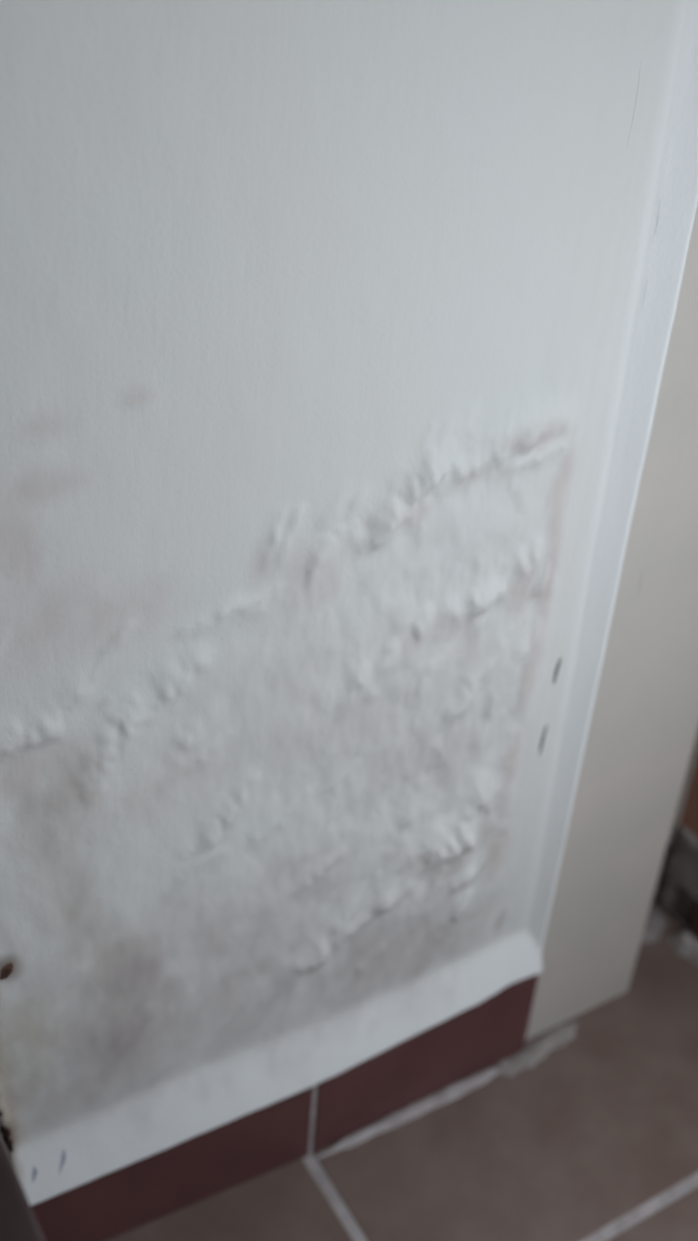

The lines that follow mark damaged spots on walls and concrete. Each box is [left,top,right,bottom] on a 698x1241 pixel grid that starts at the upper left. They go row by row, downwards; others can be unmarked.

rust [0,963,13,980]
rust [0,1111,14,1152]